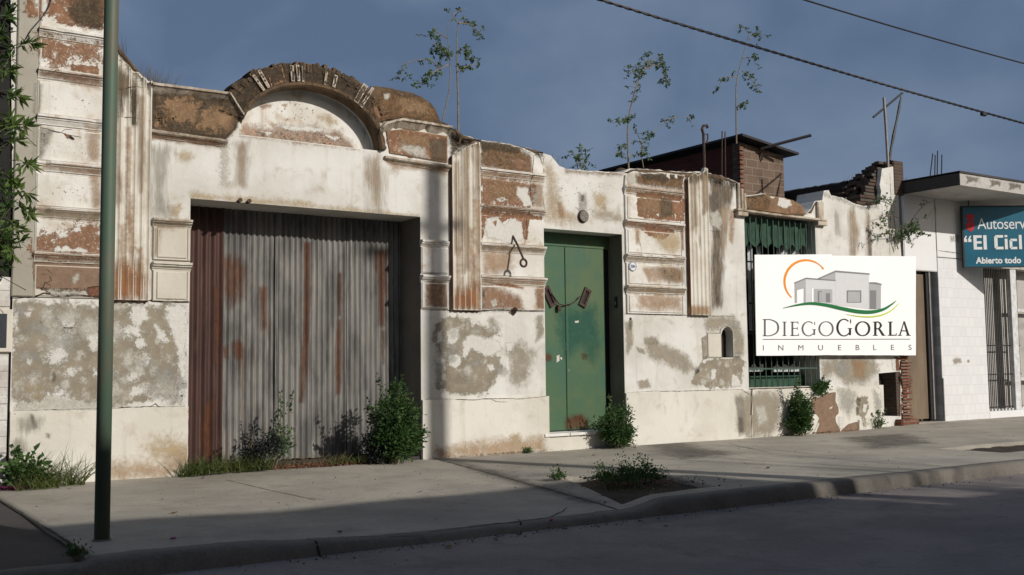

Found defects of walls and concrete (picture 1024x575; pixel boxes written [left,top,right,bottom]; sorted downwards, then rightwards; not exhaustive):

flaking render [24,0,104,80]
water stain [116,50,439,254]
peeling [480,170,543,243]
flaking render [636,191,685,221]
peeling [11,219,100,411]
peeling [112,299,188,407]
corrosion [215,258,242,362]
corrosion [301,243,310,400]
peeling [432,315,512,396]
water stain [627,171,806,356]
peeling [692,336,745,389]
flaking render [810,392,869,434]